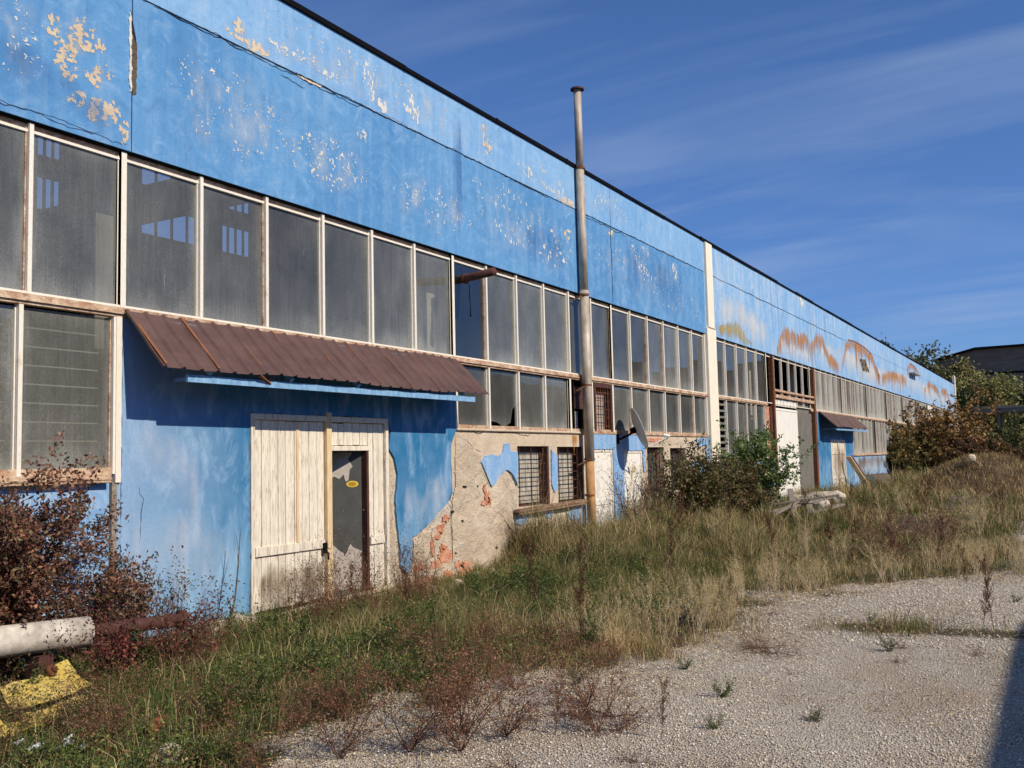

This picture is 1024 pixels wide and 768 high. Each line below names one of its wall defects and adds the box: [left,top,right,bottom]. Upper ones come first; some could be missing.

peeling [2,0,129,145]
peeling [164,55,367,193]
peeling [224,9,436,125]
peeling [393,178,571,268]
peeling [518,161,576,208]
corrosion [777,329,837,367]
corrosion [845,339,919,382]
spalling [389,433,577,590]